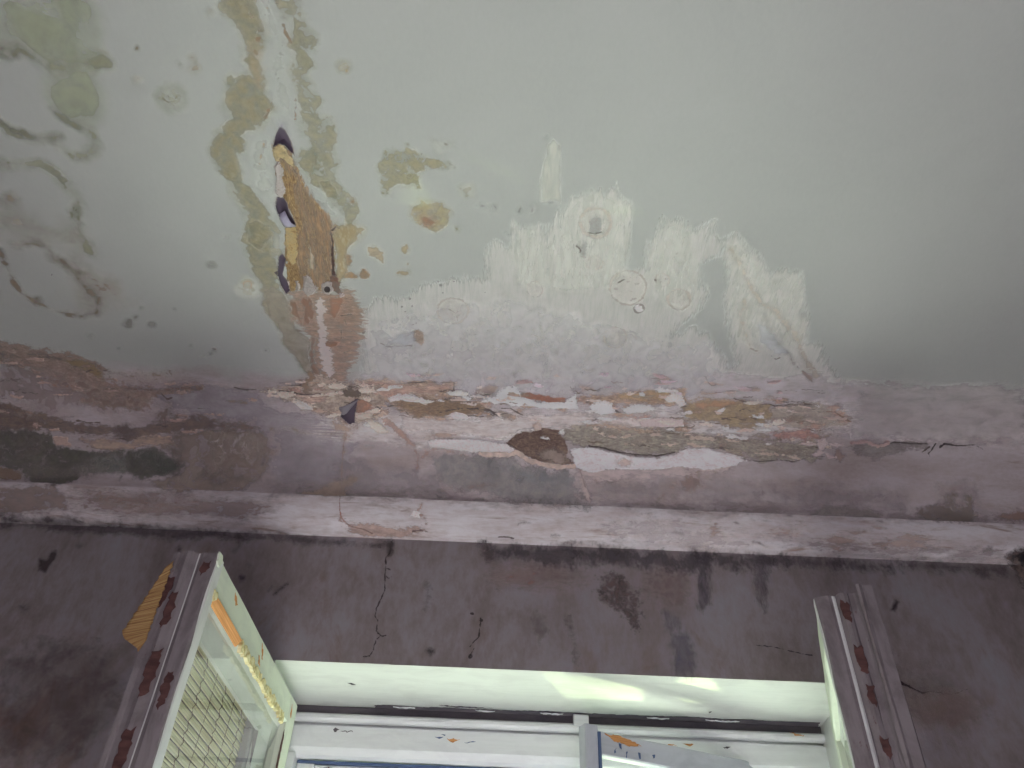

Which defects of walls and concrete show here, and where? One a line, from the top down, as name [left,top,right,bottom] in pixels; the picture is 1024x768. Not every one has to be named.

leakage [210,0,359,375]
peeling [272,144,360,298]
leakage [0,341,272,492]
spalling [234,371,927,481]
crack [922,443,983,455]
crack [339,434,427,657]
mould [598,573,643,629]
leakage [695,552,711,610]